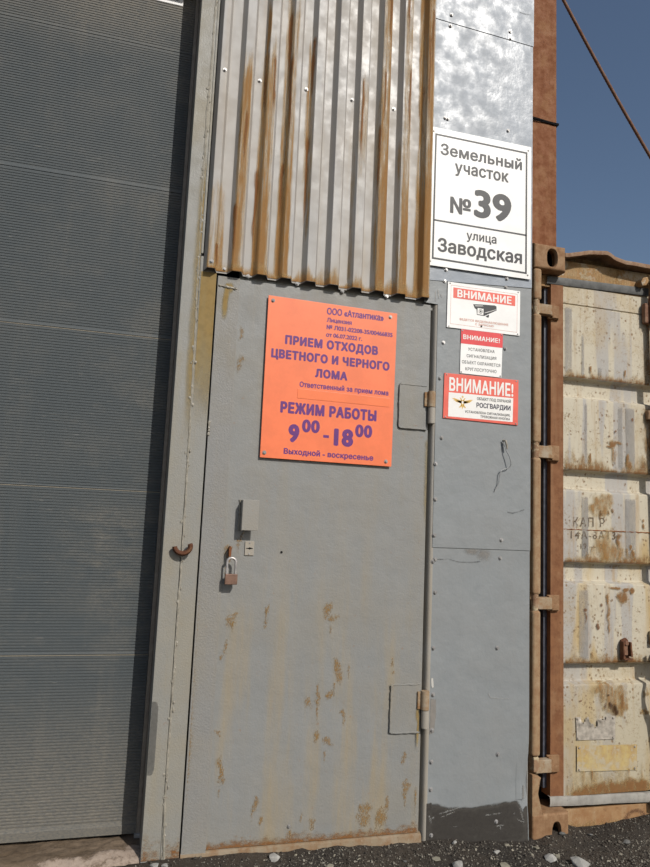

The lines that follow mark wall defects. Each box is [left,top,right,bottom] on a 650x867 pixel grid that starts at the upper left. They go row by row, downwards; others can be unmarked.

corrosion [207,0,436,298]
corrosion [565,324,650,386]
corrosion [565,409,650,475]
corrosion [589,495,614,518]
corrosion [564,532,650,564]
corrosion [597,587,635,633]
corrosion [595,680,628,716]
corrosion [567,769,650,796]
corrosion [206,799,418,850]